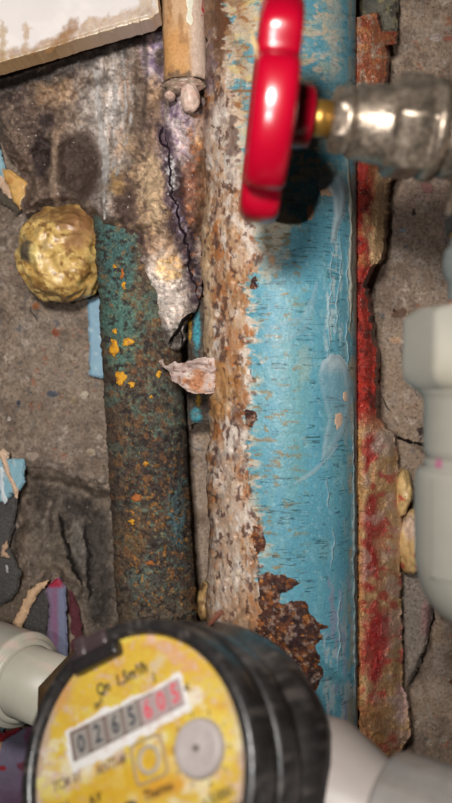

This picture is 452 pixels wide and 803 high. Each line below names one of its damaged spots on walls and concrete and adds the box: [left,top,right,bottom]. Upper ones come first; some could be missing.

peeling [0,149,27,215]
water stain [87,69,128,219]
crack [158,125,199,345]
peeling [347,160,355,329]
crack [397,436,423,446]
spalling [0,448,119,656]
peeling [335,391,359,714]
rust [255,571,329,691]
crack [406,609,444,689]